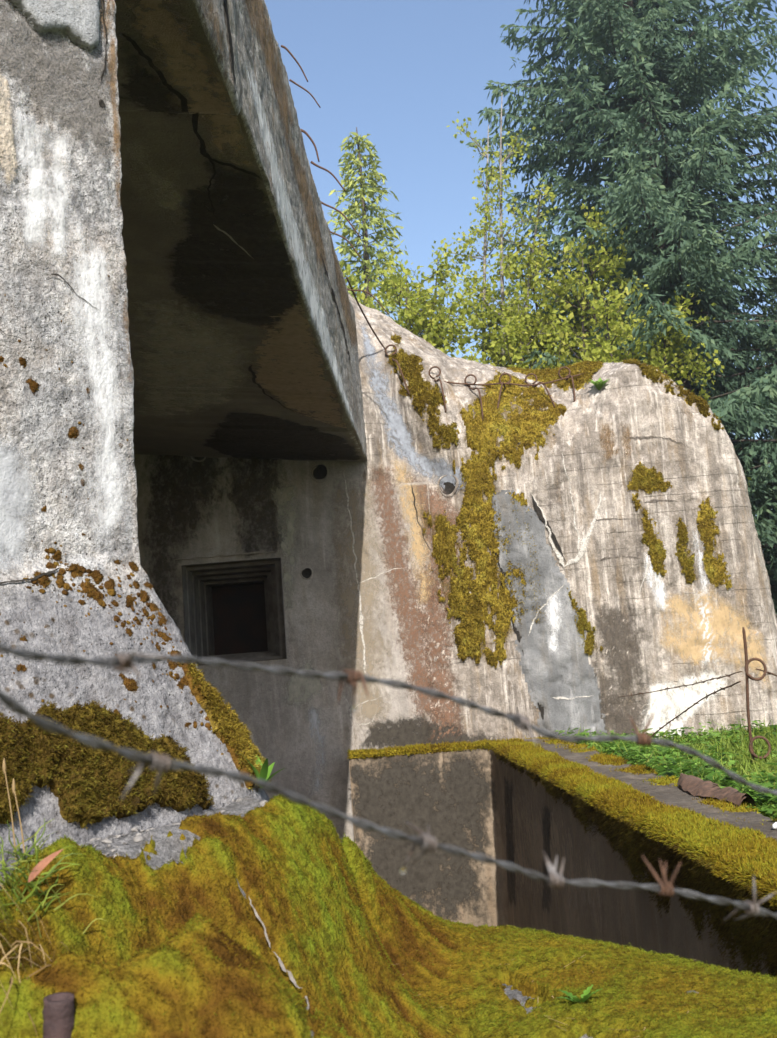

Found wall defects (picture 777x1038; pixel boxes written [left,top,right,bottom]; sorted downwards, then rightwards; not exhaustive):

spalling [0,0,114,182]
crack [100,0,260,220]
leakage [119,0,360,624]
crack [531,495,566,561]
leakage [333,452,602,924]